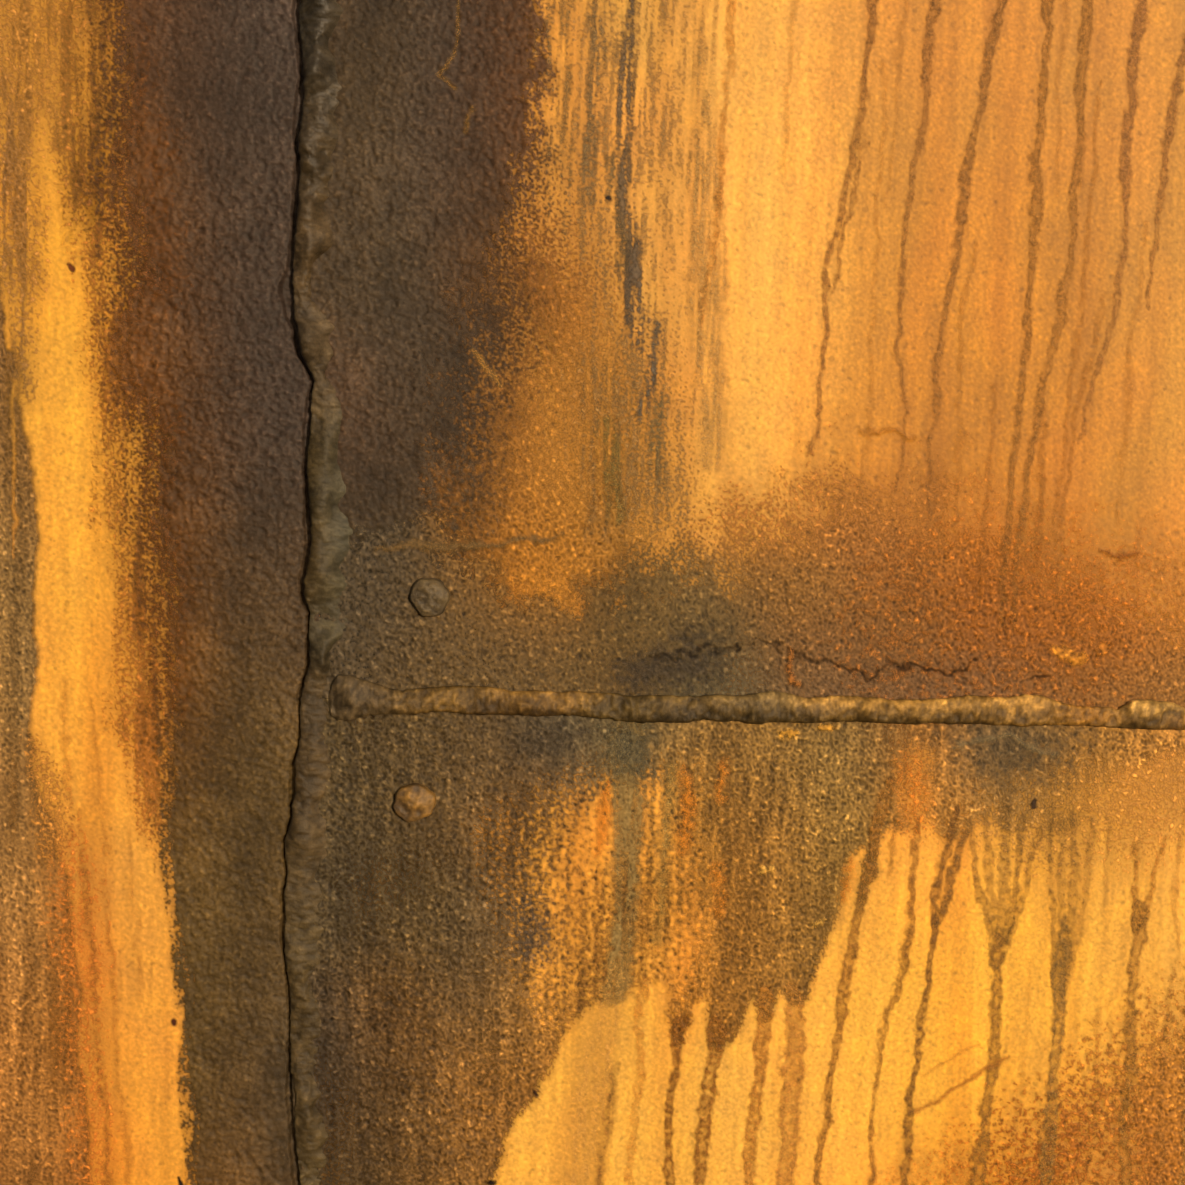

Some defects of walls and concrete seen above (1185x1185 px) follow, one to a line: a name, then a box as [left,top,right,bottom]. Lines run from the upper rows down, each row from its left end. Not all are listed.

rust [883,840,918,1023]
rust [1127,872,1156,994]
rust [663,1154,675,1185]
rust [814,1049,839,1185]
rust [951,917,1185,1185]